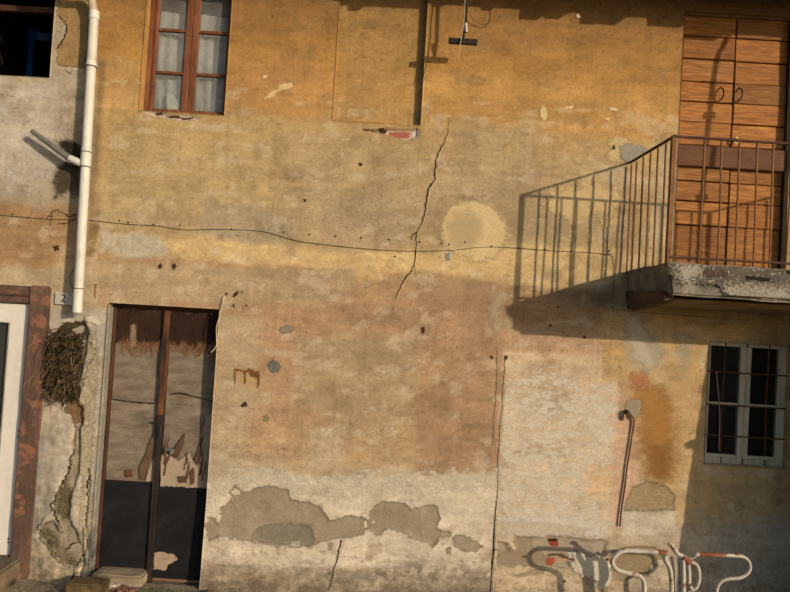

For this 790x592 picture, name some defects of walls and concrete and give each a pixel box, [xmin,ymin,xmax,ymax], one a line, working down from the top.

peeling [264,82,293,101]
peeling [363,127,419,141]
leakage [53,141,81,199]
crack [394,120,450,318]
corrosion [234,368,260,387]
crack [37,452,92,580]
peeling [204,366,663,581]
crack [490,347,506,592]
peeling [623,481,676,512]
crack [328,540,344,591]